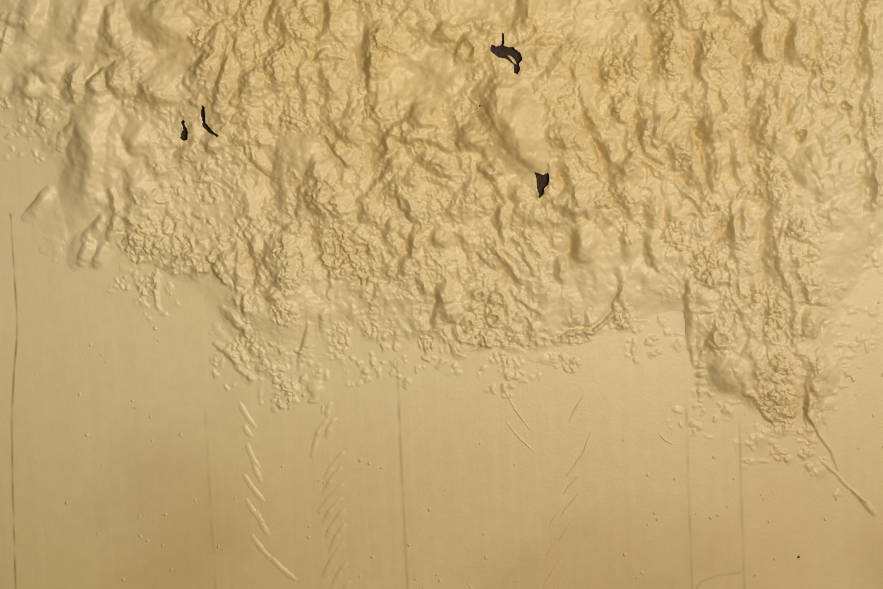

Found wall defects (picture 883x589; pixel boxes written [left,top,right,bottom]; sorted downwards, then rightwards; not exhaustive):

spalling [21,0,588,414]
peeling [550,0,883,517]